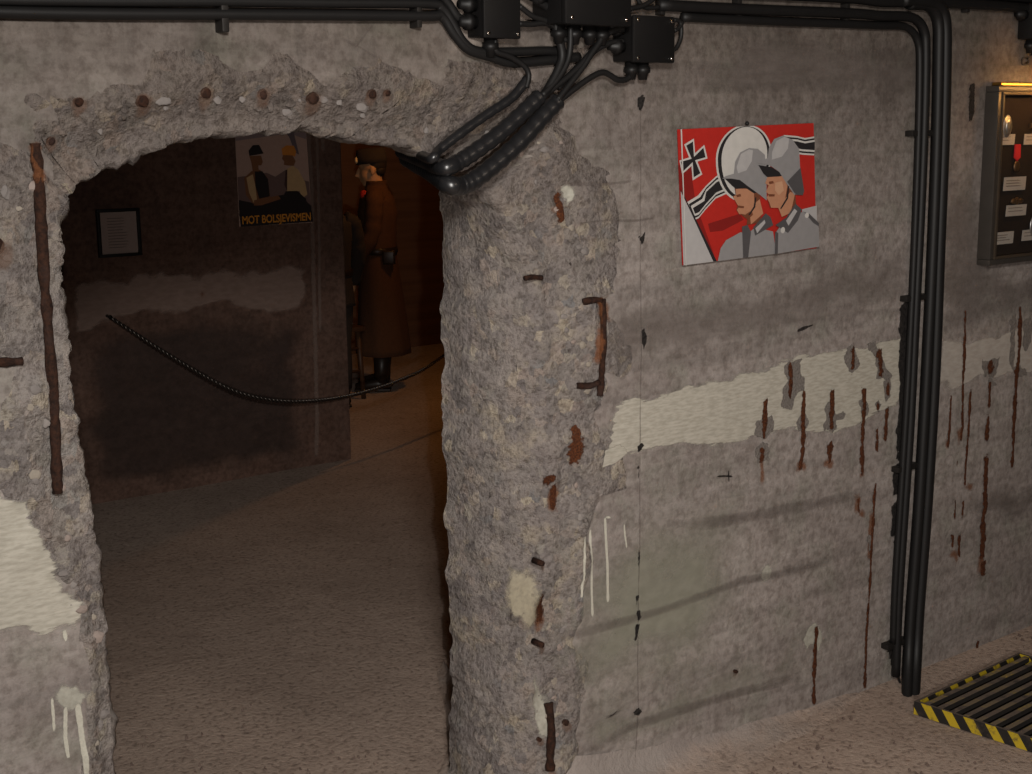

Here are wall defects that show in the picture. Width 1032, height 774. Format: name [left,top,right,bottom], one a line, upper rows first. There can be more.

rust [29,143,63,494]
spalling [0,48,551,774]
rust [576,297,608,396]
spalling [438,113,901,774]
rust [754,359,809,481]
rust [844,341,892,475]
rust [946,311,989,576]
peeling [940,327,1032,389]
rust [982,307,1032,467]
leakage [581,516,711,660]
leakage [51,698,89,774]
rust [544,702,556,772]